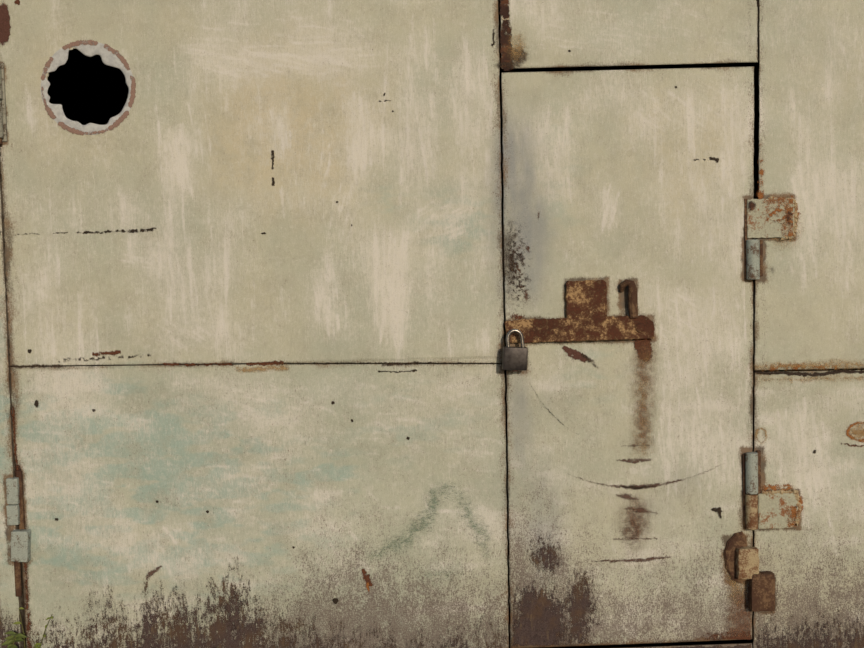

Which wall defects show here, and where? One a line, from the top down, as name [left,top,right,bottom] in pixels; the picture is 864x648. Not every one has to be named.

rust [0,0,20,45]
rust [497,0,527,71]
rust [749,158,799,240]
rust [503,231,531,299]
rust [634,338,653,446]
rust [756,361,864,381]
rust [841,421,864,447]
rust [23,563,32,648]